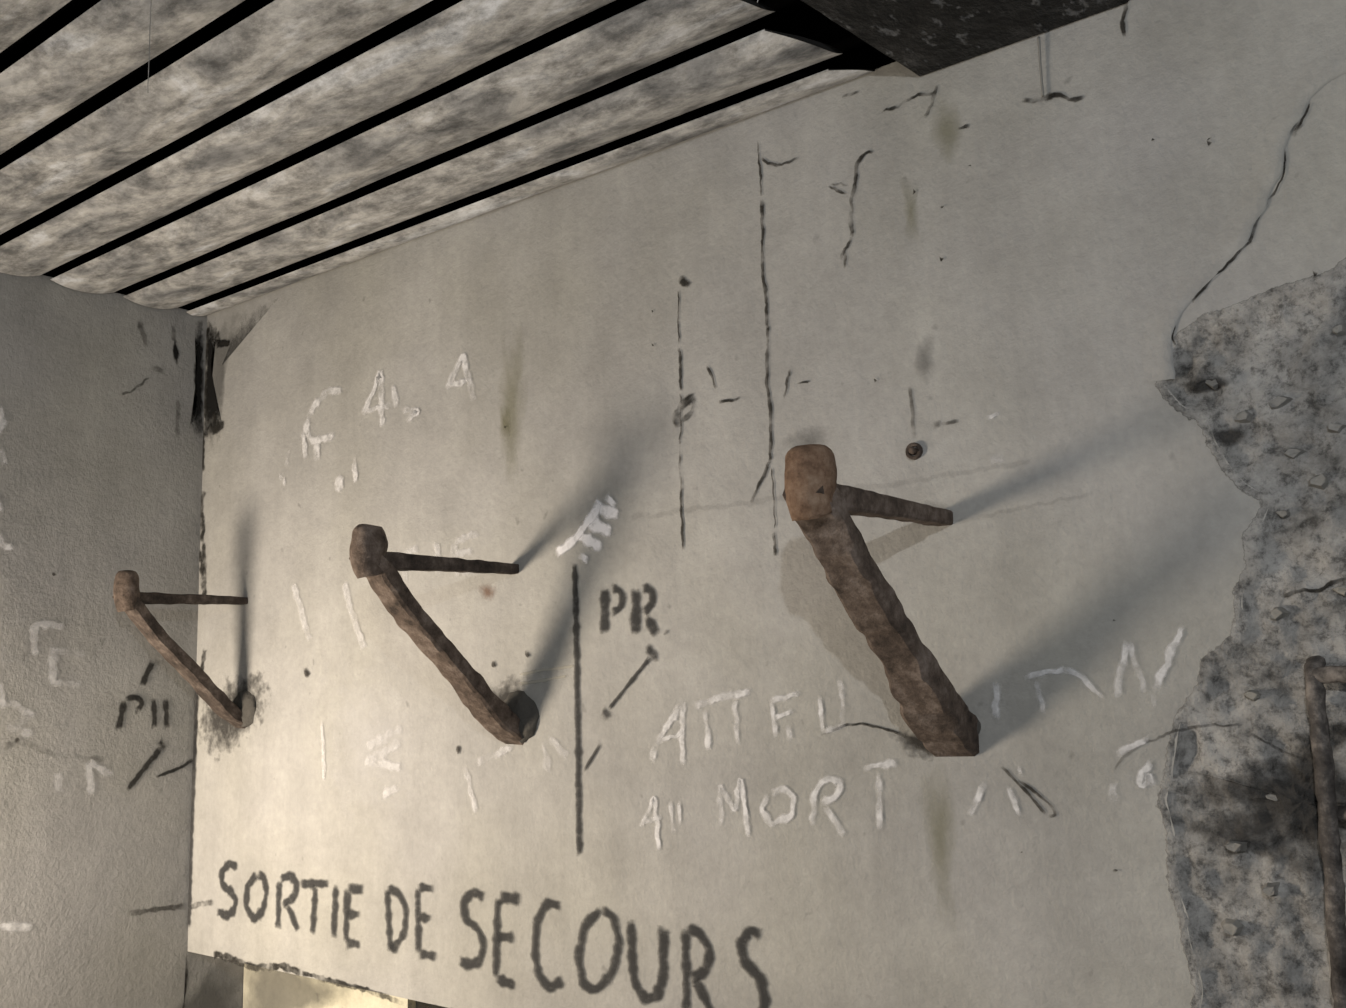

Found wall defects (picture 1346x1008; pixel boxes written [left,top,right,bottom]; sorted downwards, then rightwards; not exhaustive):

crack [674,149,808,555]
crack [830,150,871,265]
spalling [1143,44,1346,1008]
crack [1194,104,1310,300]